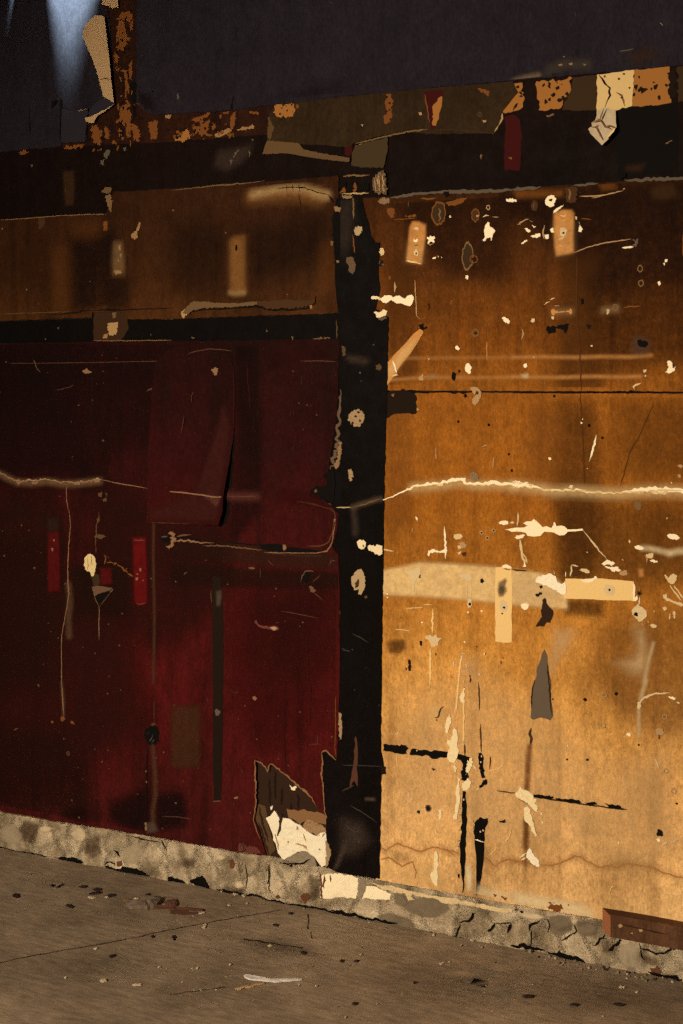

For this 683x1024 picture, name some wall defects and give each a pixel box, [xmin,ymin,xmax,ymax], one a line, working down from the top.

corrosion [62,0,275,152]
peeling [503,56,617,145]
crack [296,342,683,510]
crack [0,472,144,713]
spalling [499,519,583,539]
crack [453,913,675,959]